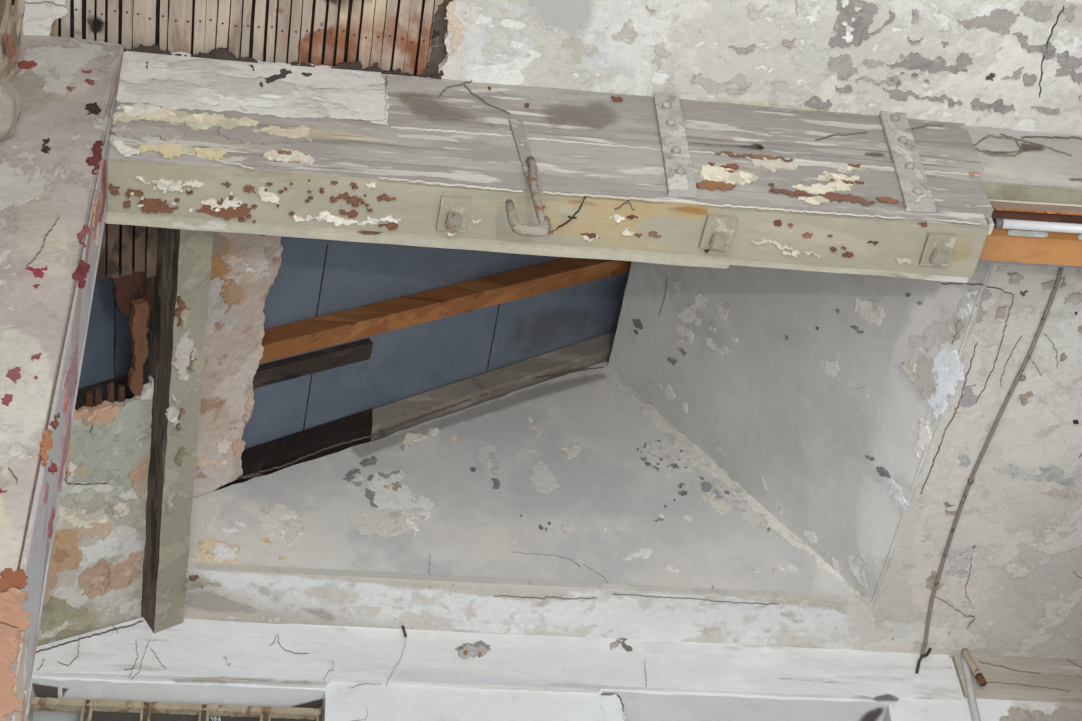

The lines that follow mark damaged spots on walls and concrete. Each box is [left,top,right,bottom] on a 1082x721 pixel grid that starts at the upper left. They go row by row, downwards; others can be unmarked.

spalling [124,44,315,87]
spalling [331,61,444,79]
peeling [805,0,1015,115]
peeling [957,0,1082,101]
damp [550,104,613,125]
crack [815,131,868,141]
crack [912,124,1082,157]
peeling [696,151,899,206]
crack [556,196,586,230]
crack [920,282,1058,495]
peeling [0,337,152,721]
crack [323,637,407,721]